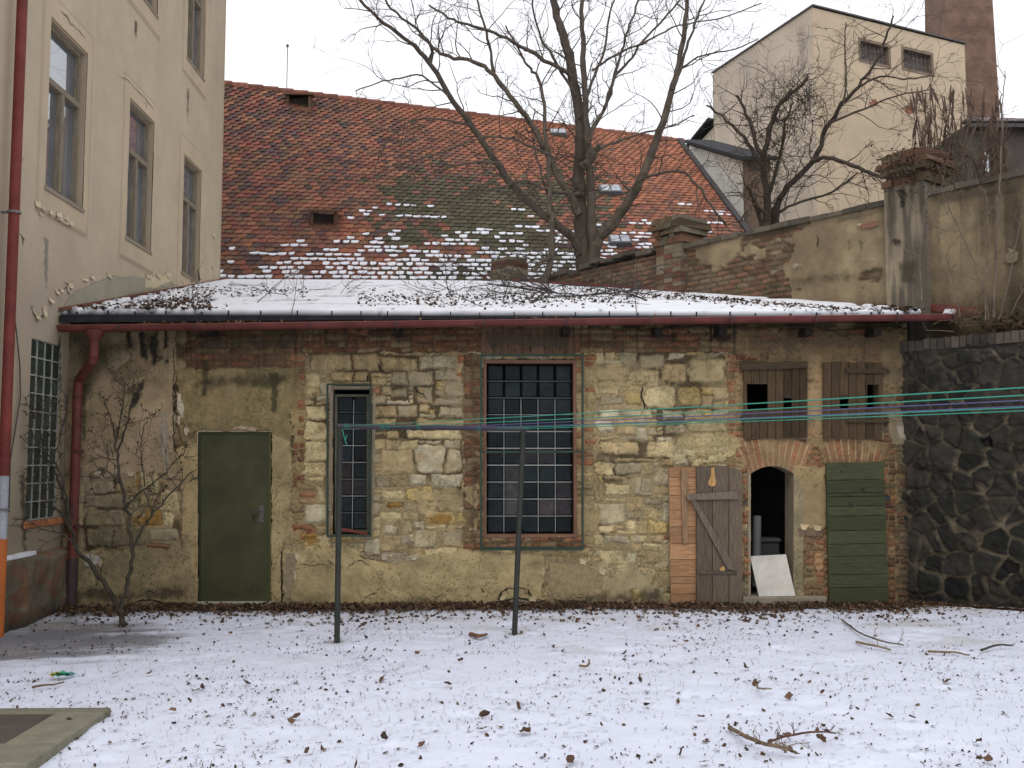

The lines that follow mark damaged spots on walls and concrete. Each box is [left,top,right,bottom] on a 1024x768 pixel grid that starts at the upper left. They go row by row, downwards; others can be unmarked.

peeling [145,271,172,288]
flaking render [176,392,189,435]